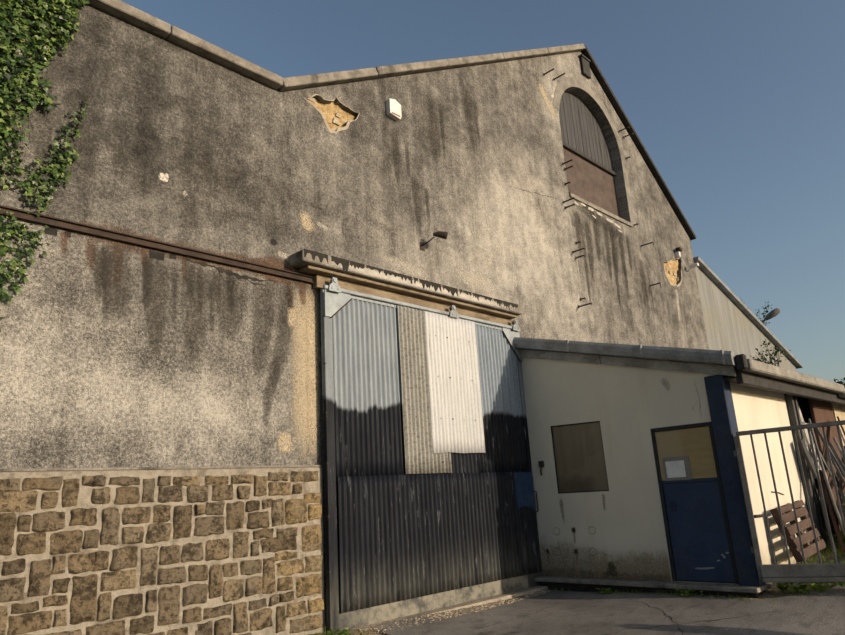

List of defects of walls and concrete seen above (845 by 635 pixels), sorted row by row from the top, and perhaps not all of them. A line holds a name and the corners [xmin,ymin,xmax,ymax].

spalling [303,94,360,134]
rust [86,226,316,312]
crack [176,257,279,286]
peeling [304,249,518,310]
leakage [568,208,654,306]
spalling [663,258,682,287]
flaking render [278,293,319,452]